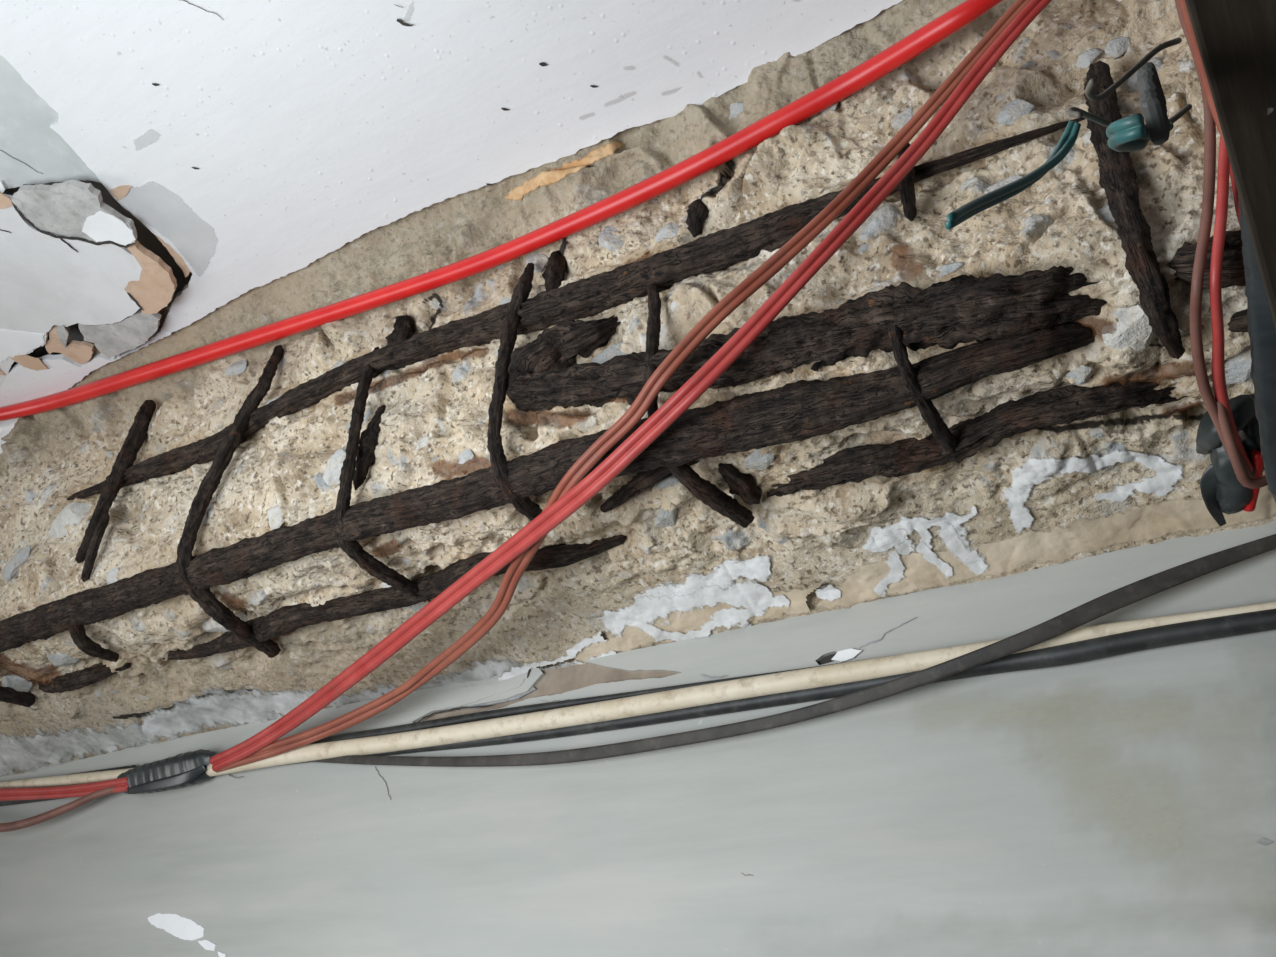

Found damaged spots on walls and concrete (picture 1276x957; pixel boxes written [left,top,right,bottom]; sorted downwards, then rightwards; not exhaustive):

rust [891,244,922,279]
rust [1066,319,1112,339]
rust [335,348,487,405]
spalling [0,0,1276,739]
rust [1102,362,1195,387]
rust [505,410,589,428]
rust [432,456,491,480]
rust [372,540,398,557]
rust [0,654,59,685]
spalling [45,722,248,765]